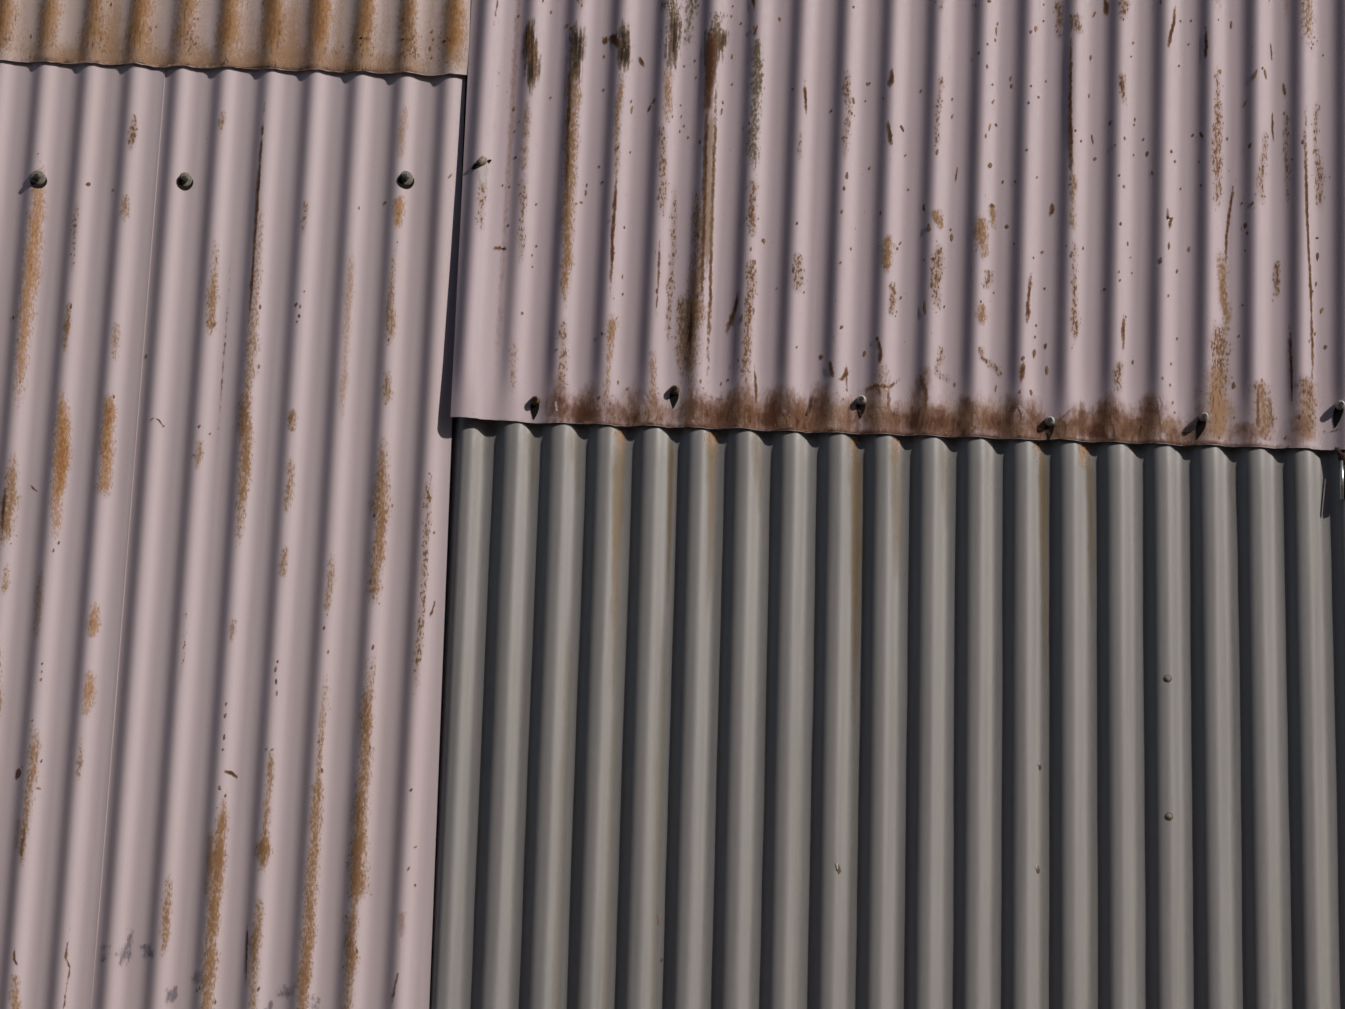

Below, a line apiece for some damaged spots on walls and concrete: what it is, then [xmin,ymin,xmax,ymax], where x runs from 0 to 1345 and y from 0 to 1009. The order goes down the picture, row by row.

corrosion [1160,0,1232,57]
corrosion [12,186,45,391]
corrosion [236,110,265,537]
corrosion [549,69,1338,462]
corrosion [1030,0,1131,348]
corrosion [51,393,71,552]
corrosion [96,395,116,493]
corrosion [369,438,393,604]
corrosion [199,770,238,1009]
corrosion [256,748,274,867]
corrosion [297,686,331,1009]
corrosion [342,666,376,1009]